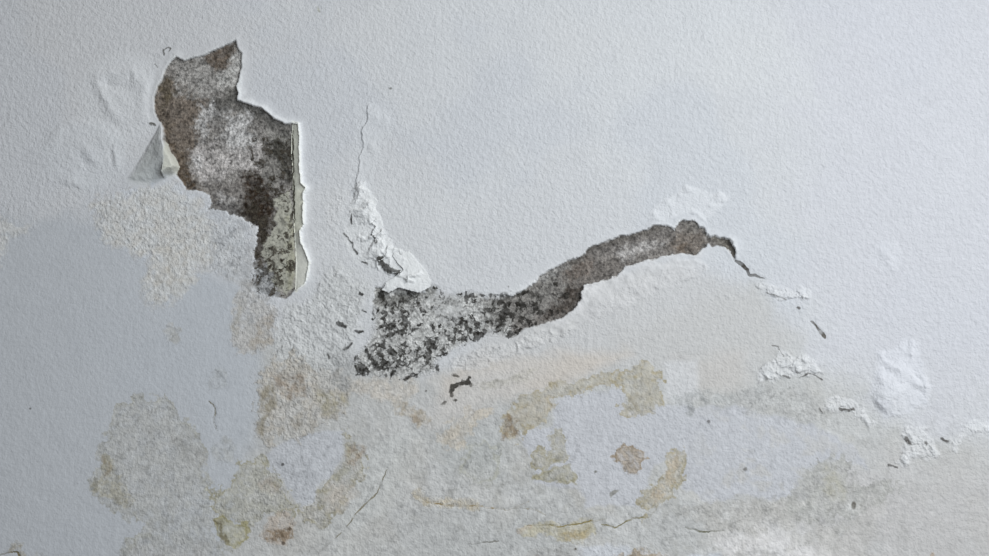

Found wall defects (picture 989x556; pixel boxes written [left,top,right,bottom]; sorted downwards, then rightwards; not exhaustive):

peeling [122,32,319,301]
leakage [87,198,829,556]
peeling [342,179,748,381]
crack [315,470,387,556]
leakage [635,445,903,556]